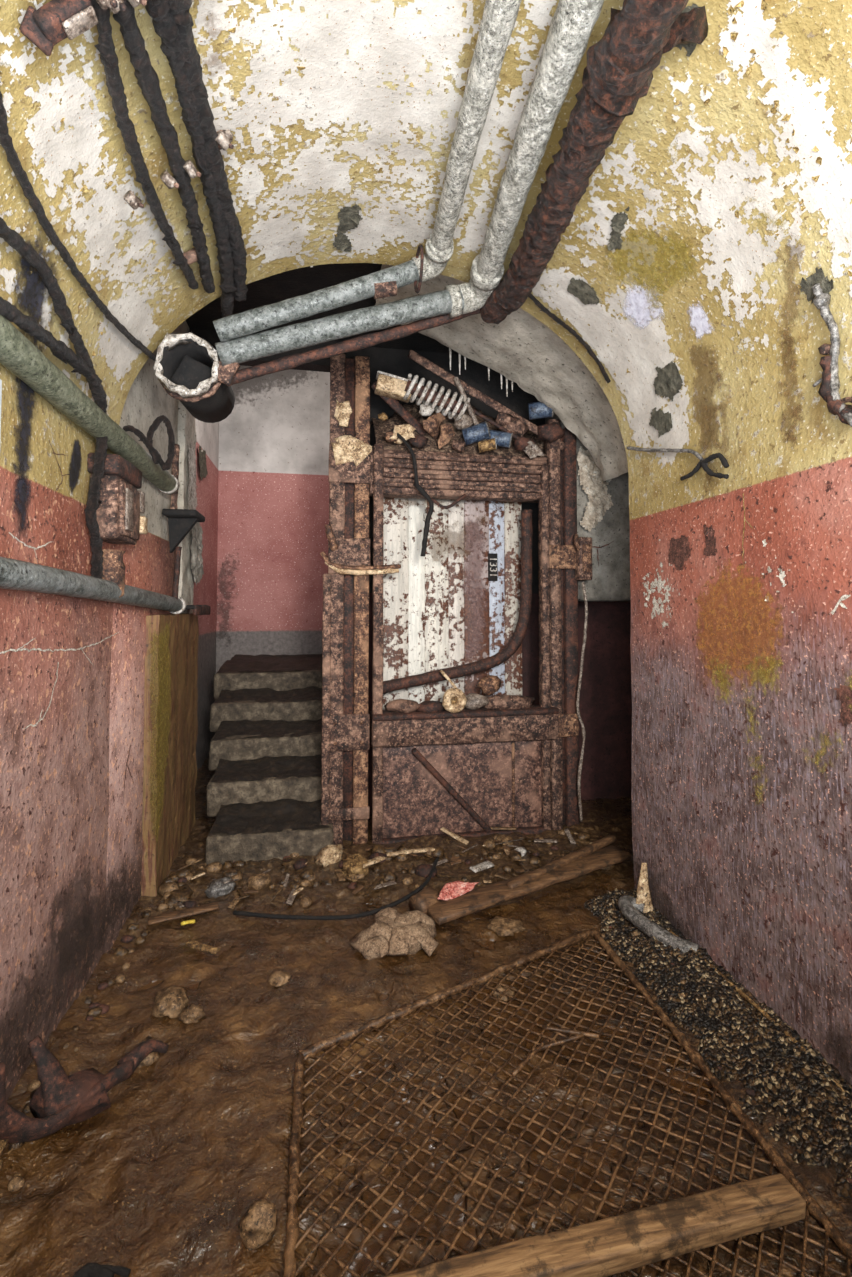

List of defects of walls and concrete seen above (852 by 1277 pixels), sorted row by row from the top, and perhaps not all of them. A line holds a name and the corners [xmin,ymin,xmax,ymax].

peeling [0,0,183,411]
peeling [191,0,482,267]
peeling [532,0,852,469]
corrosion [463,521,487,658]
peeling [642,524,717,634]